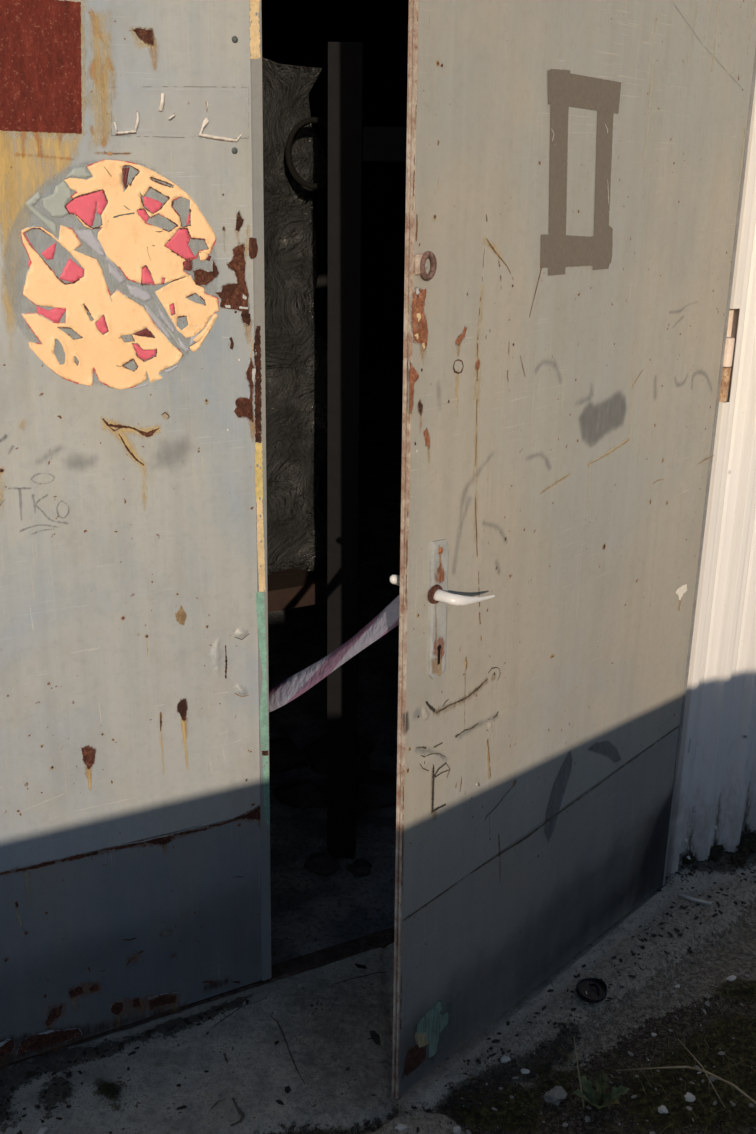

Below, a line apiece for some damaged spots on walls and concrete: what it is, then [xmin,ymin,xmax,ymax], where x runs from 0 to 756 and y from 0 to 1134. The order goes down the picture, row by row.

corrosion [132,27,156,68]
peeling [21,160,219,390]
corrosion [193,210,262,443]
corrosion [410,287,428,352]
corrosion [102,412,170,466]
corrosion [408,360,430,452]
corrosion [176,698,188,742]
corrosion [80,744,96,789]
corrosion [0,967,179,1066]
peeling [402,1002,452,1078]